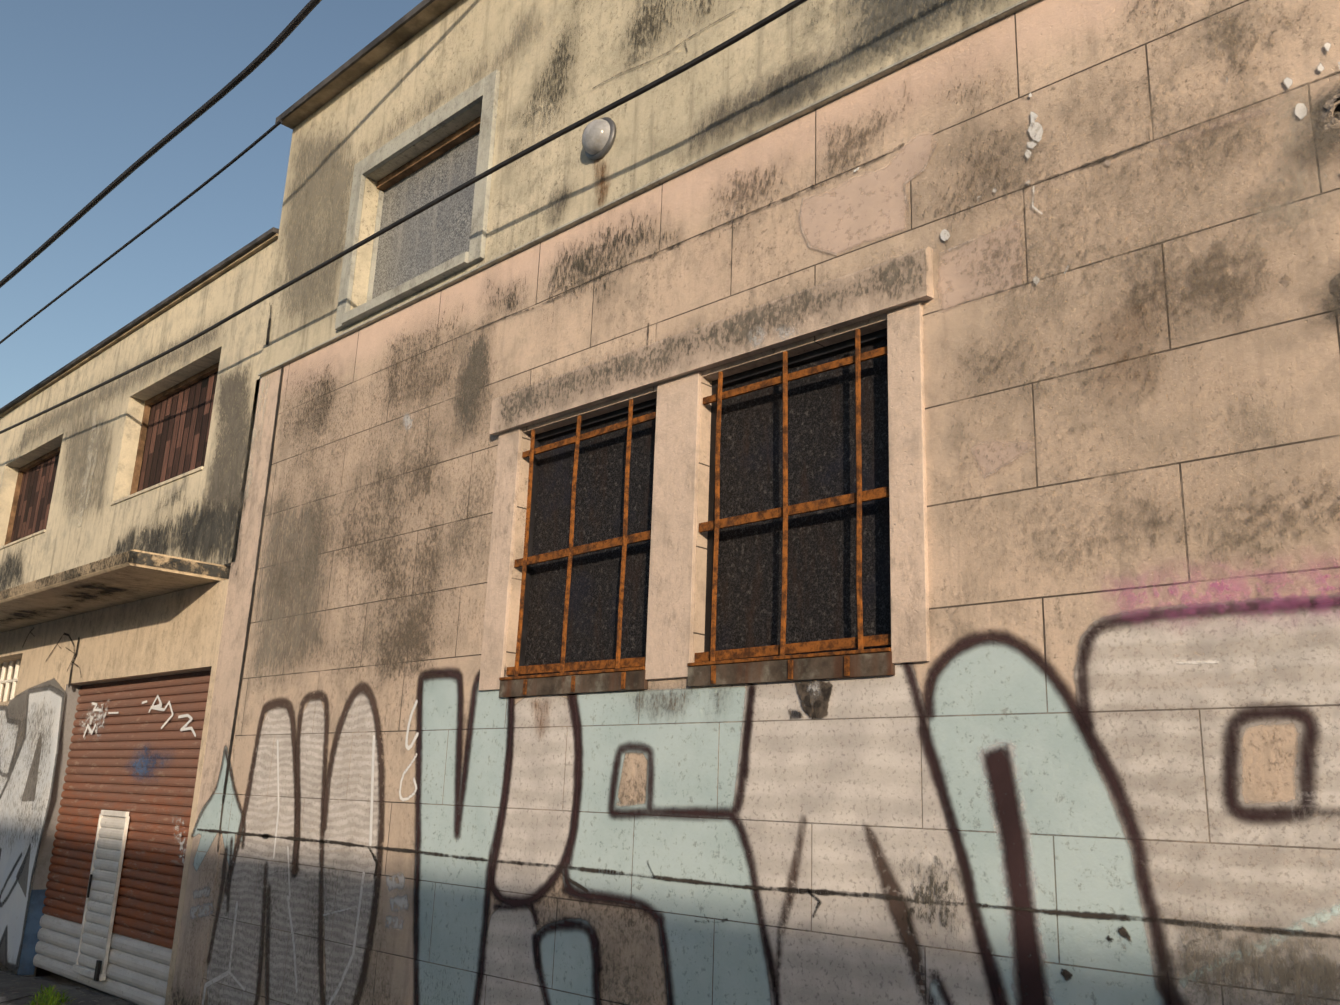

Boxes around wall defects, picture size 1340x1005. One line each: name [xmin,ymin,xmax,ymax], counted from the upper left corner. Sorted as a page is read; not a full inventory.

damp [622,0,715,63]
damp [690,0,996,150]
damp [821,85,912,178]
damp [284,132,353,317]
damp [0,367,251,599]
damp [280,364,334,440]
damp [256,433,443,681]
damp [382,215,675,441]
damp [499,252,928,426]